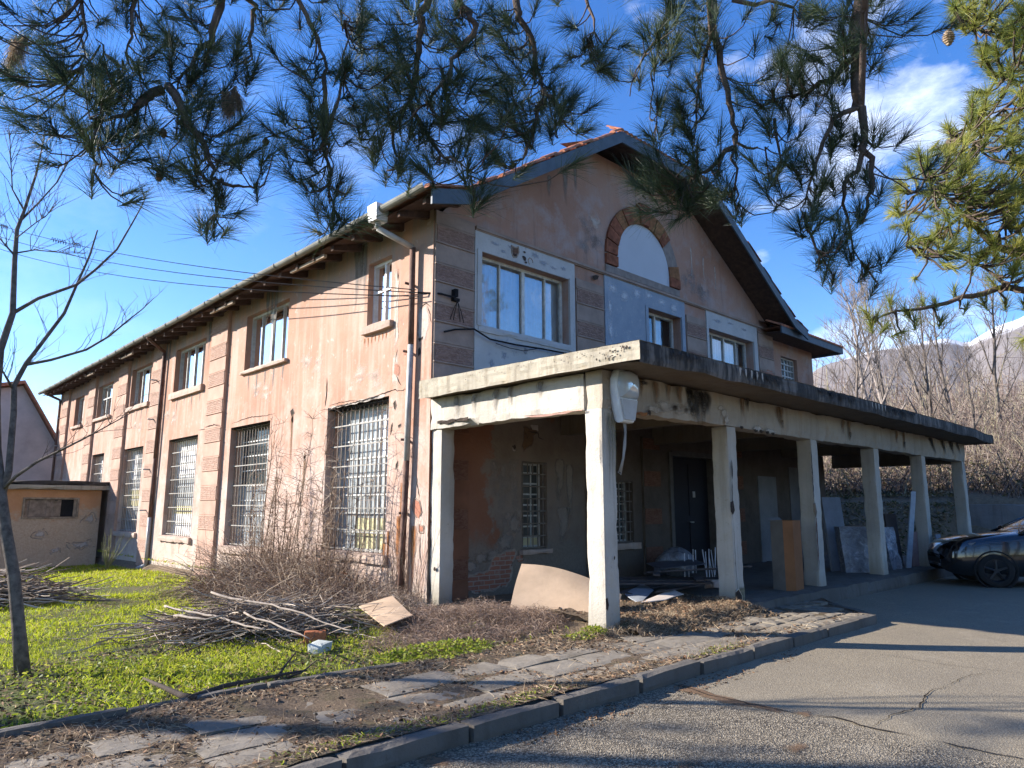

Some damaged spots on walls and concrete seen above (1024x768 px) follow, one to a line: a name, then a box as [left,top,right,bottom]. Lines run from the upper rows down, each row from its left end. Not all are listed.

damp [640,379,711,418]
crack [672,658,1009,735]
crack [936,740,1023,759]